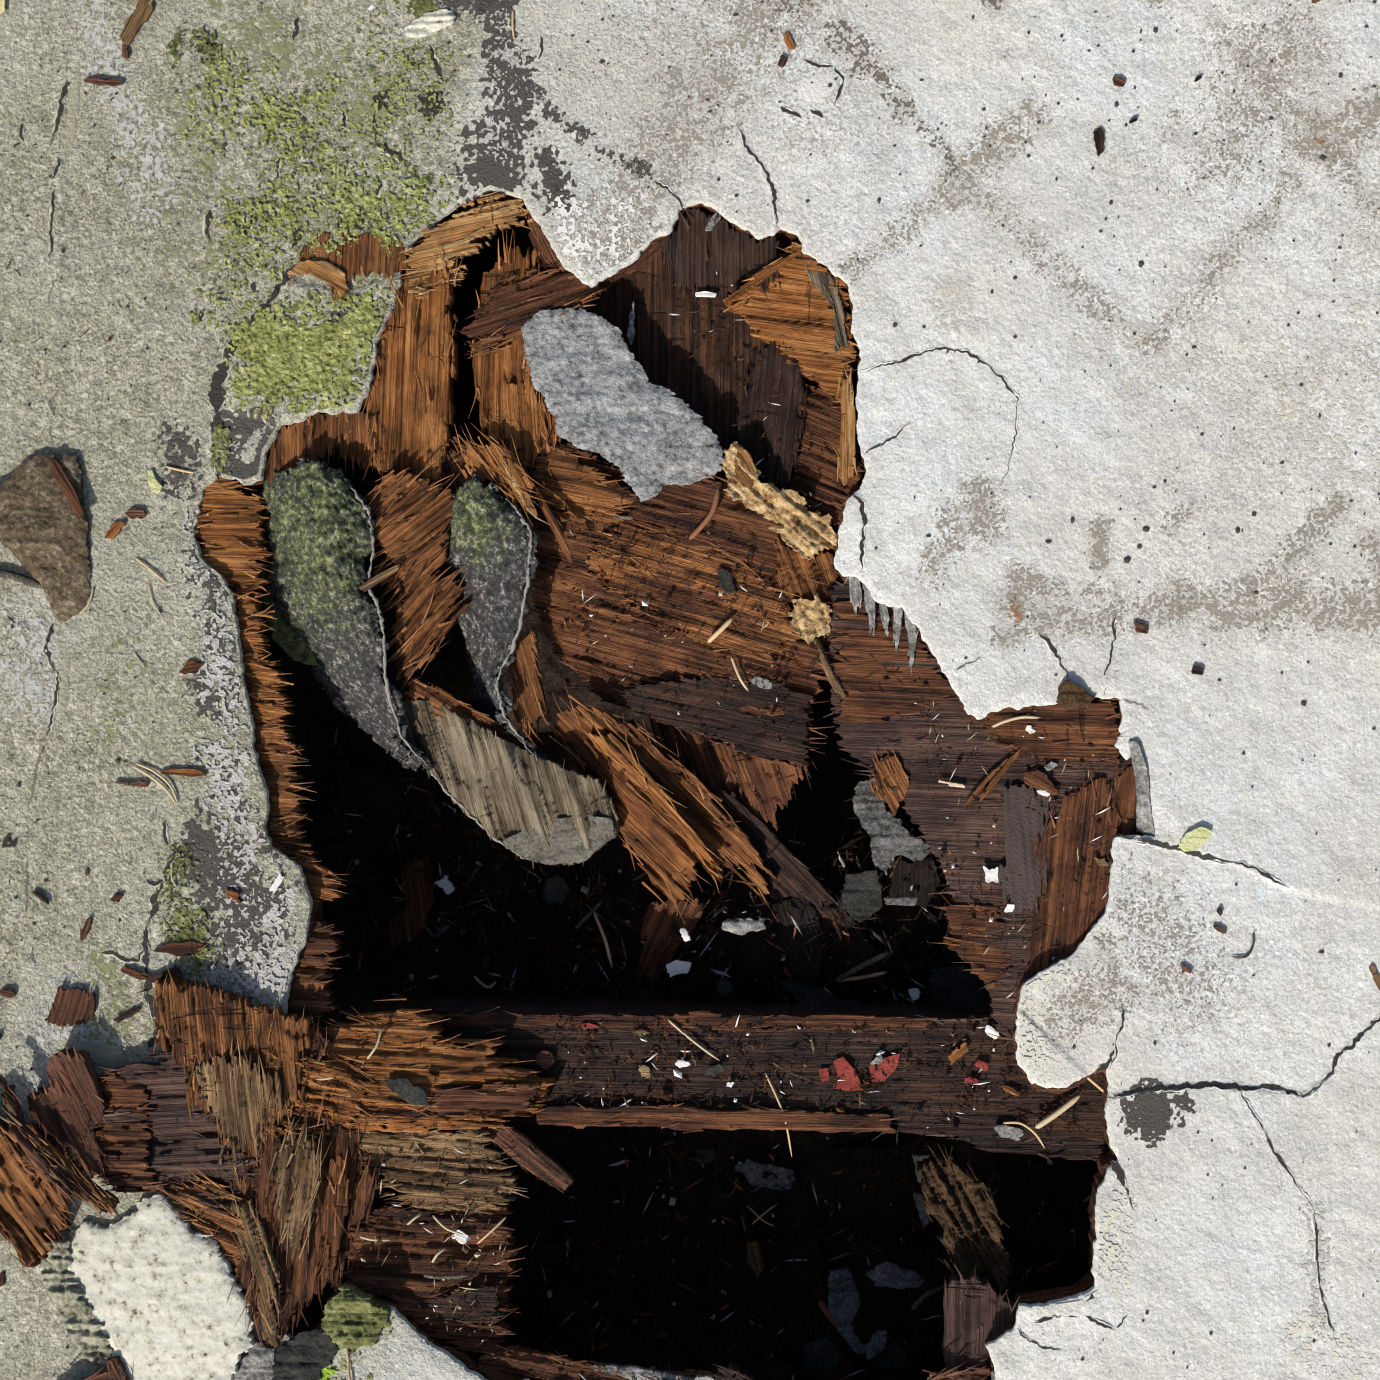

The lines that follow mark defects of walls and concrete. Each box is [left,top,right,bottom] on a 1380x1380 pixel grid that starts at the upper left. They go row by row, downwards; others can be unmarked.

leakage [501,0,1380,358]
peeling [151,406,277,506]
crack [859,346,1020,486]
leakage [905,471,1380,656]
peeling [181,549,239,722]
peeling [170,747,301,968]
peeling [721,917,766,935]
peeling [852,778,930,875]
peeling [1128,740,1155,836]
crack [1092,1004,1380,1347]
peeling [828,1260,925,1360]
crack [1017,1294,1127,1350]